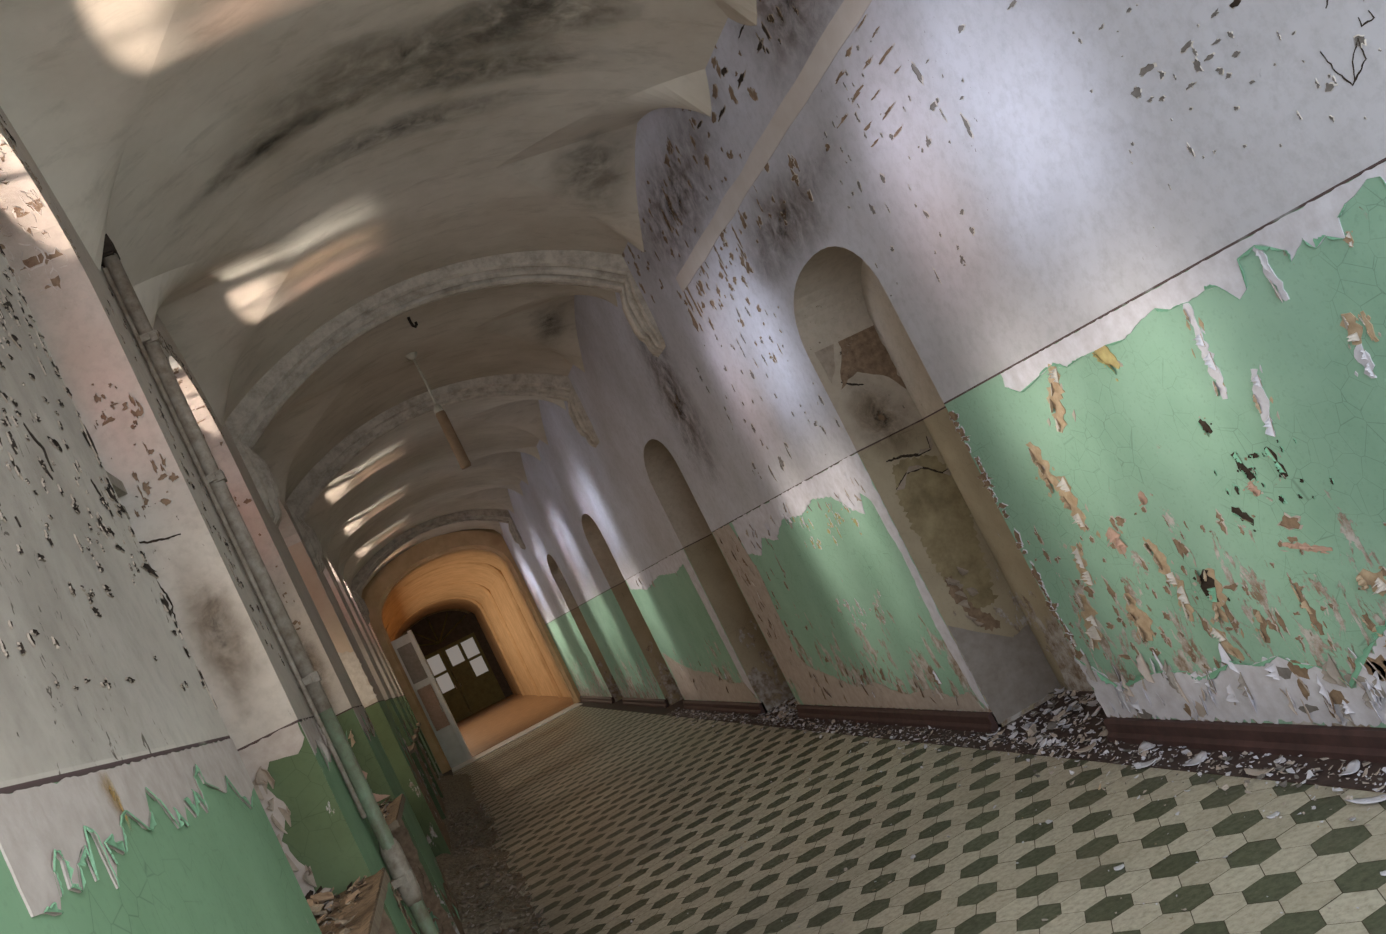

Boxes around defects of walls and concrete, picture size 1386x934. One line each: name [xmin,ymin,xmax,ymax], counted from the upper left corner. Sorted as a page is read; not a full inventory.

leakage [245,121,301,164]
leakage [654,154,697,241]
leakage [769,188,808,251]
peeling [0,115,244,710]
peeling [622,0,1386,827]
peeling [0,717,331,918]
peeling [390,726,465,934]